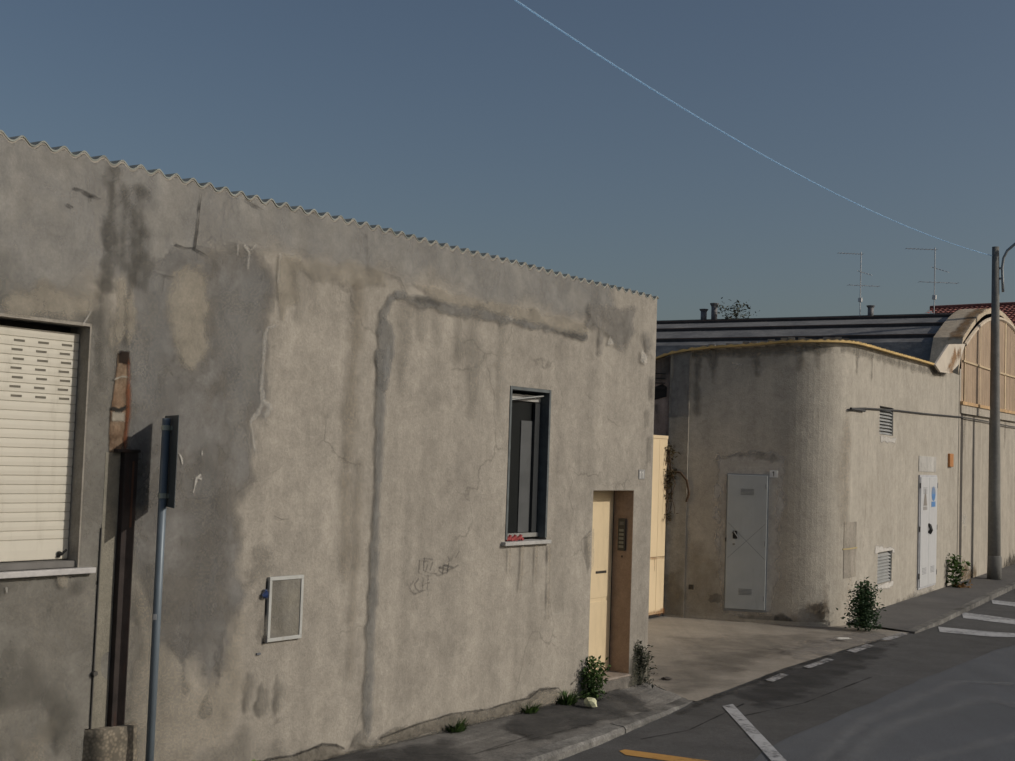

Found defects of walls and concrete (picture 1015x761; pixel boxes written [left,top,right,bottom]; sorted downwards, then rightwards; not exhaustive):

crack [176,201,204,254]
leakage [586,305,635,353]
leakage [0,250,272,761]